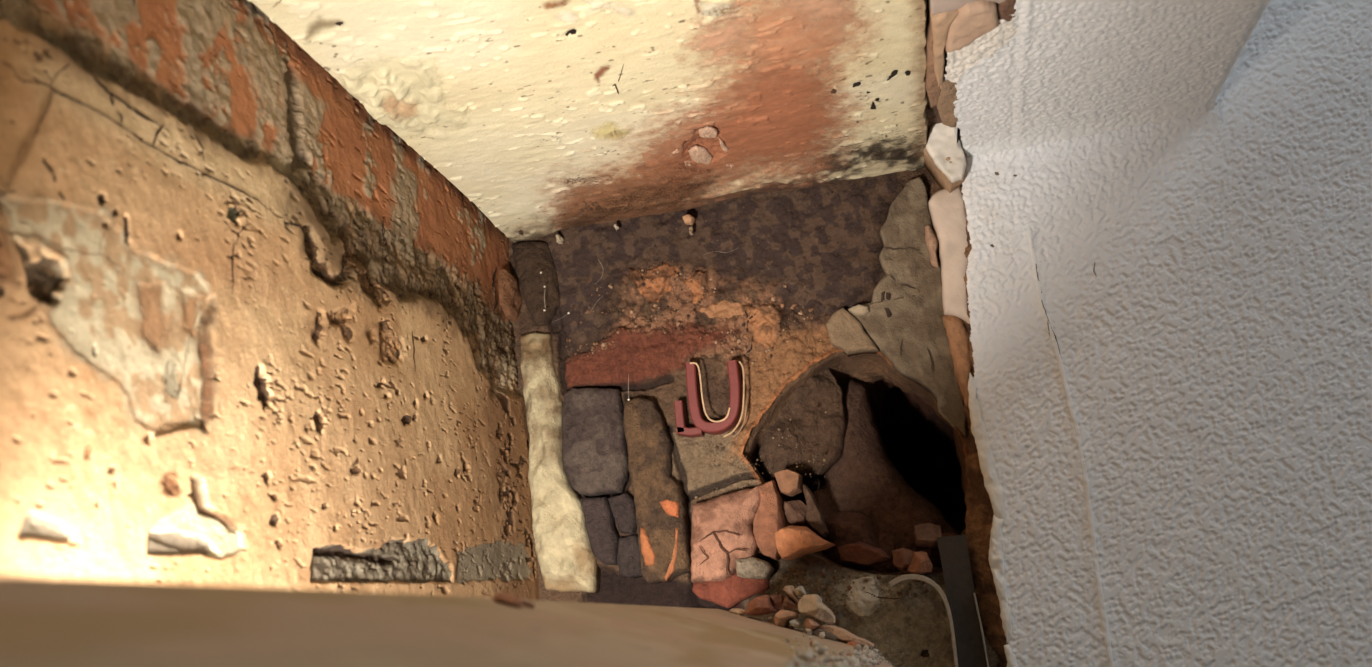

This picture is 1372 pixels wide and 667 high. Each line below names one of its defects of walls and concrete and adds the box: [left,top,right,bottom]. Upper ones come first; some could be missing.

crack [12,63,314,296]
rust [508,0,863,242]
peeling [0,193,214,443]
spalling [660,123,1018,667]
peeling [640,527,656,566]